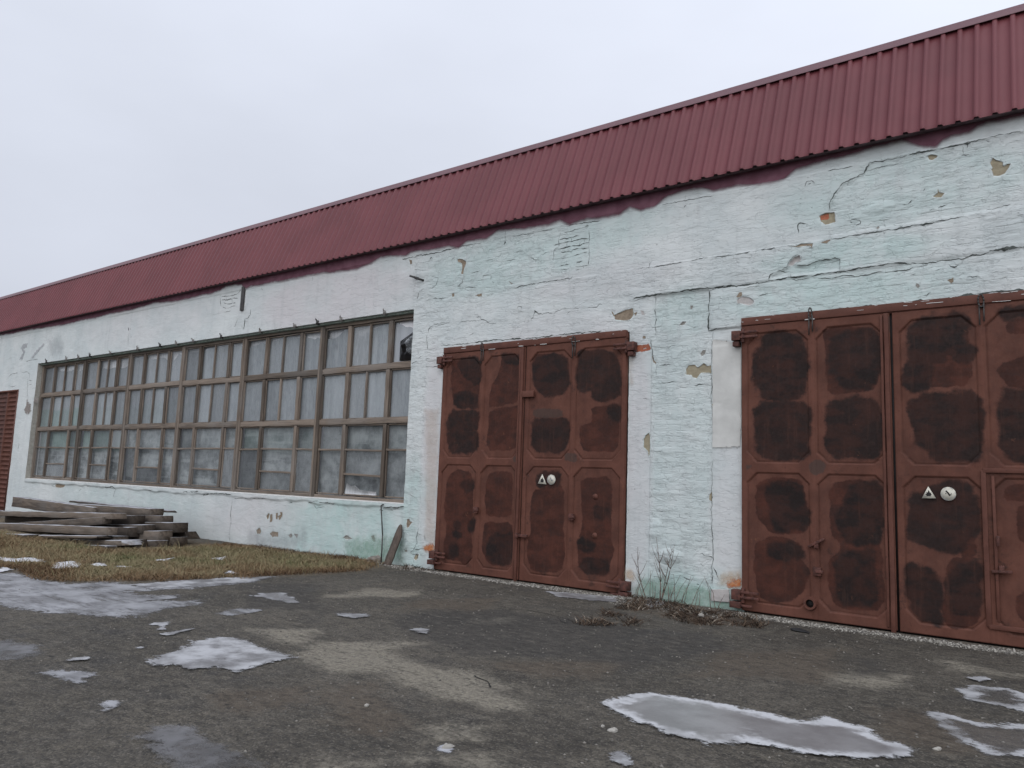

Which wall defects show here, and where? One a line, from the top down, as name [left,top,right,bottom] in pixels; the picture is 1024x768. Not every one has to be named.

crack [805,131,1024,208]
spalling [989,157,1013,178]
spalling [818,211,837,226]
crack [834,183,959,239]
spalling [611,308,645,331]
peeling [685,350,713,380]
peeling [256,512,298,538]